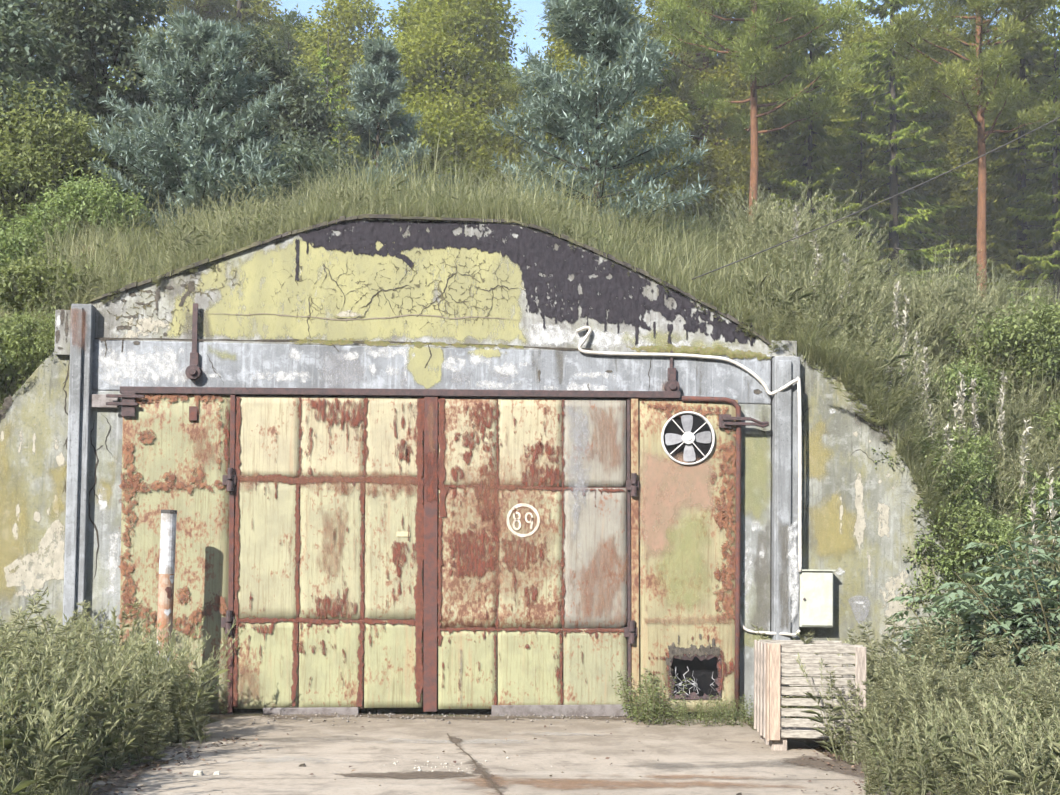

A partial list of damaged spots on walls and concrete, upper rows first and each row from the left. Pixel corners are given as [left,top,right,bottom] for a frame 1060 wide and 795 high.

crack [95,248,593,385]
peeling [100,239,654,358]
peeling [4,494,65,597]
crack [62,358,113,579]
corrosion [118,394,229,644]
corrosion [305,398,367,493]
corrosion [385,515,416,607]
corrosion [448,400,561,619]
corrosion [642,400,736,623]
leakage [802,423,828,477]
leakage [813,473,890,580]
crack [447,733,518,795]